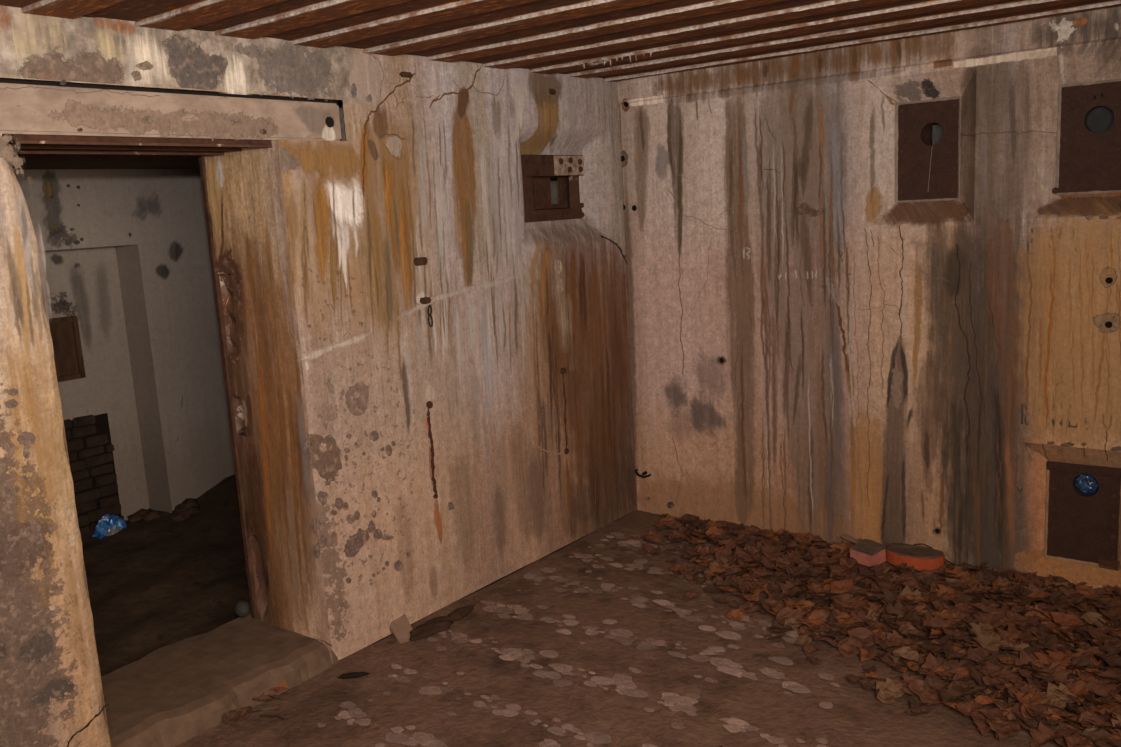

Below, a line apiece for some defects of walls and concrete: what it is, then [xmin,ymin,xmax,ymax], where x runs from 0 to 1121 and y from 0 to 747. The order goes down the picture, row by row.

spalling [48,99,279,141]
peeling [17,35,334,101]
corrosion [215,244,254,365]
damp [323,177,363,286]
crack [362,51,504,196]
corrosion [453,89,475,288]
corrosion [520,73,561,155]
damp [626,95,712,382]
damp [721,78,853,541]
corrosion [244,350,312,600]
corrosion [427,408,442,540]
damp [881,218,1121,588]